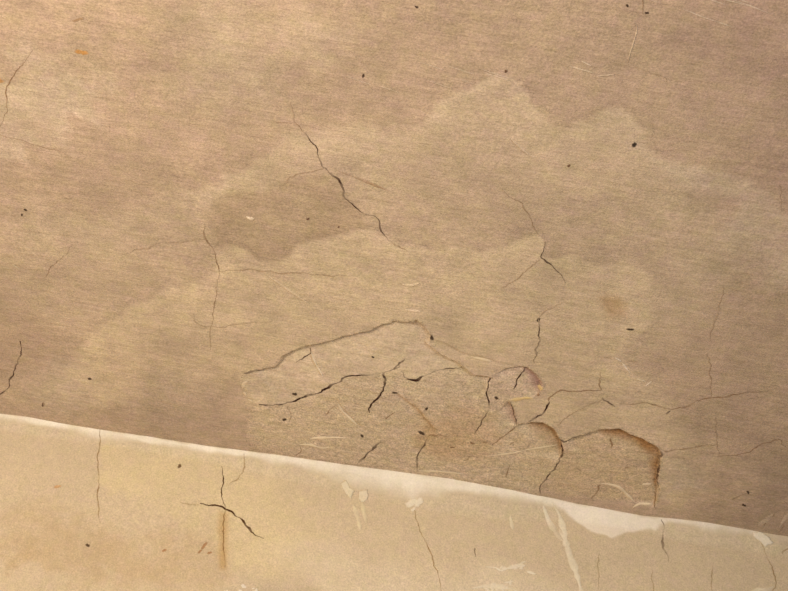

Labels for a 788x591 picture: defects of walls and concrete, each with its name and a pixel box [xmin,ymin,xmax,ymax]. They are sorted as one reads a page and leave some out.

crack [275,102,407,251]
crack [126,227,347,350]
crack [0,341,22,395]
crack [95,431,103,521]
corrosion [198,508,234,574]
crack [180,458,264,562]
flaking render [0,319,788,547]
crack [665,417,786,457]